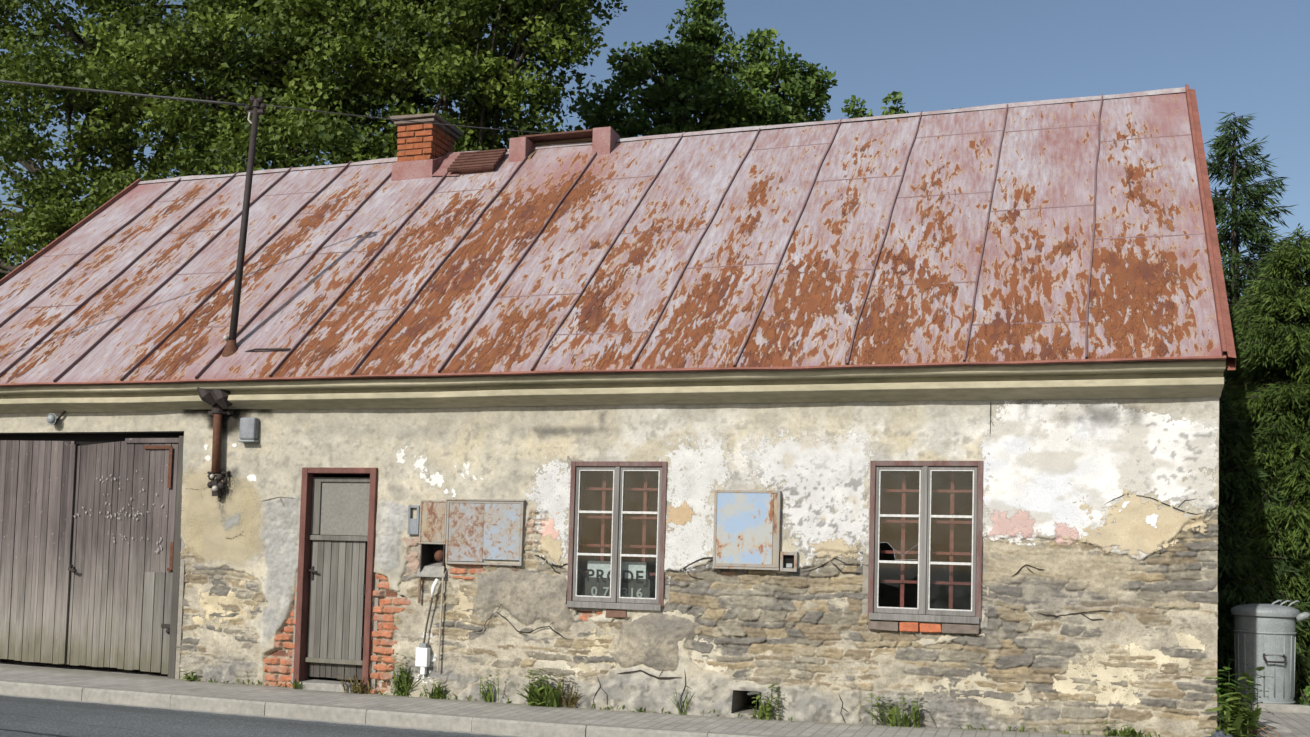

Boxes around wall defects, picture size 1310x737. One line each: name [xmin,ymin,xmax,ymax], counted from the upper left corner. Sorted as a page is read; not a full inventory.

corrosion [0,179,220,382]
corrosion [118,182,370,380]
corrosion [257,144,963,377]
corrosion [957,196,1190,362]
corrosion [1113,122,1177,232]
spalling [176,545,297,688]
spalling [369,446,627,695]
spalling [659,399,1219,737]